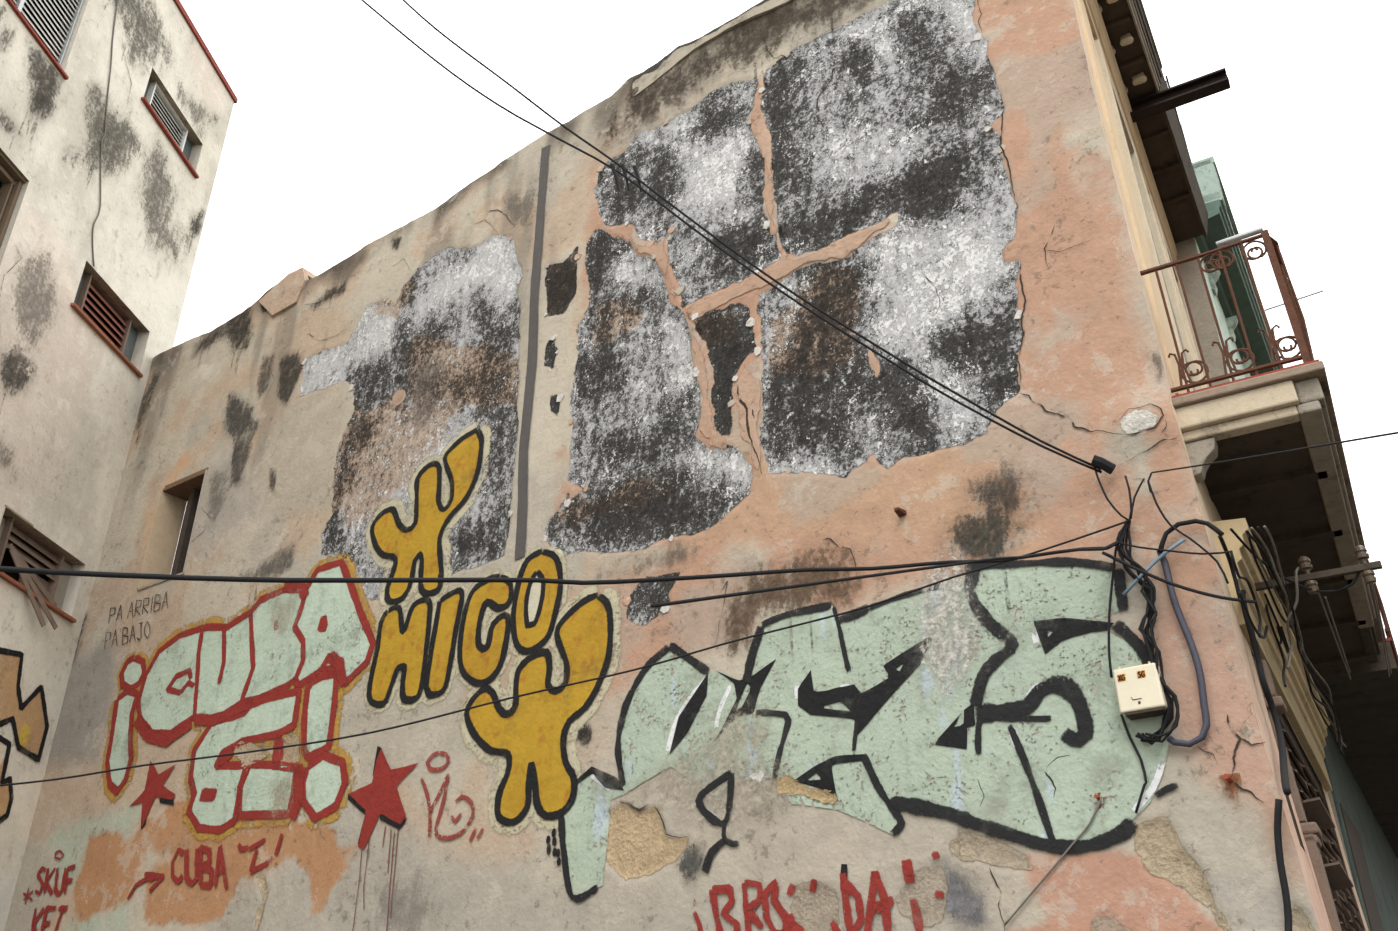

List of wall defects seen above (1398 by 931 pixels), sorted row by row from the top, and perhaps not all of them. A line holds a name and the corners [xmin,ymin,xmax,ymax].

damp [606,0,865,140]
damp [72,85,203,261]
damp [1,253,55,395]
damp [198,306,267,371]
flaking render [541,0,1025,556]
damp [211,353,303,520]
flaking render [300,235,523,601]
damp [947,469,1023,560]
flaking render [605,715,838,881]
flaking render [895,865,948,927]
flaking render [949,829,1033,870]
flaking render [1291,905,1316,931]